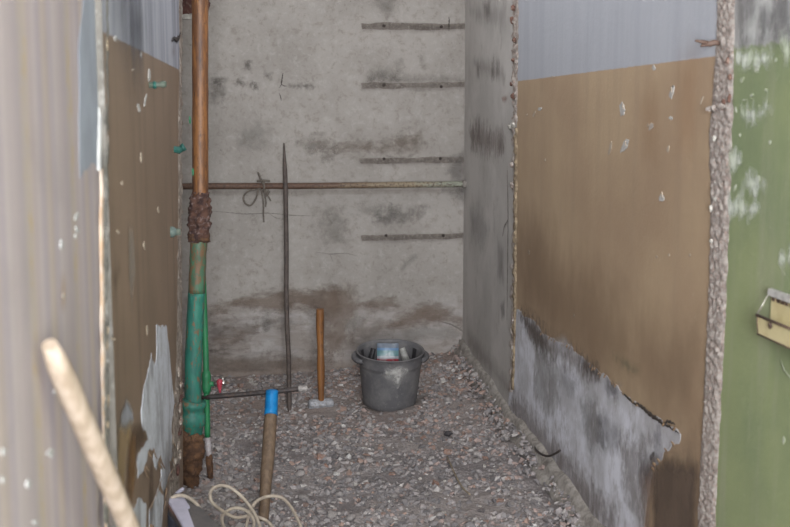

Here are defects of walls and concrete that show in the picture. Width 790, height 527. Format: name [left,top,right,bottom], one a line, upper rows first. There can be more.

peeling [133,0,192,527]
water stain [217,290,356,352]
peeling [507,0,681,527]